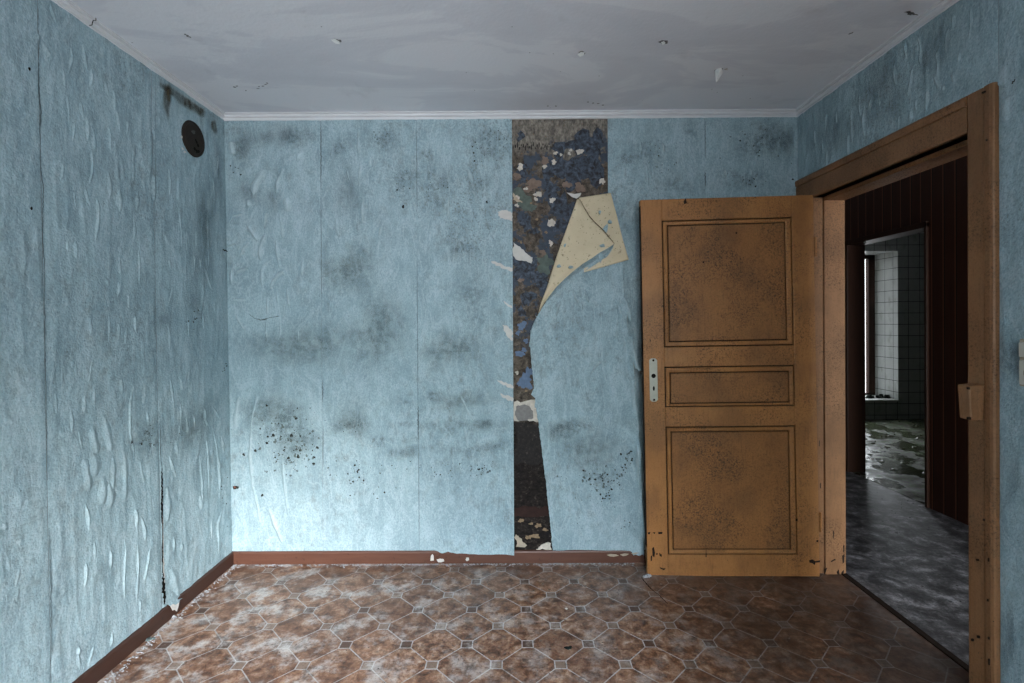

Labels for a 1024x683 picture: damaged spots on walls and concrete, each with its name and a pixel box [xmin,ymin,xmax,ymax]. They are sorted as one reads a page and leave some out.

damp [164,86,217,132]
spalling [512,119,608,550]
crack [159,425,167,604]
mould [242,407,493,499]
mould [556,451,633,508]